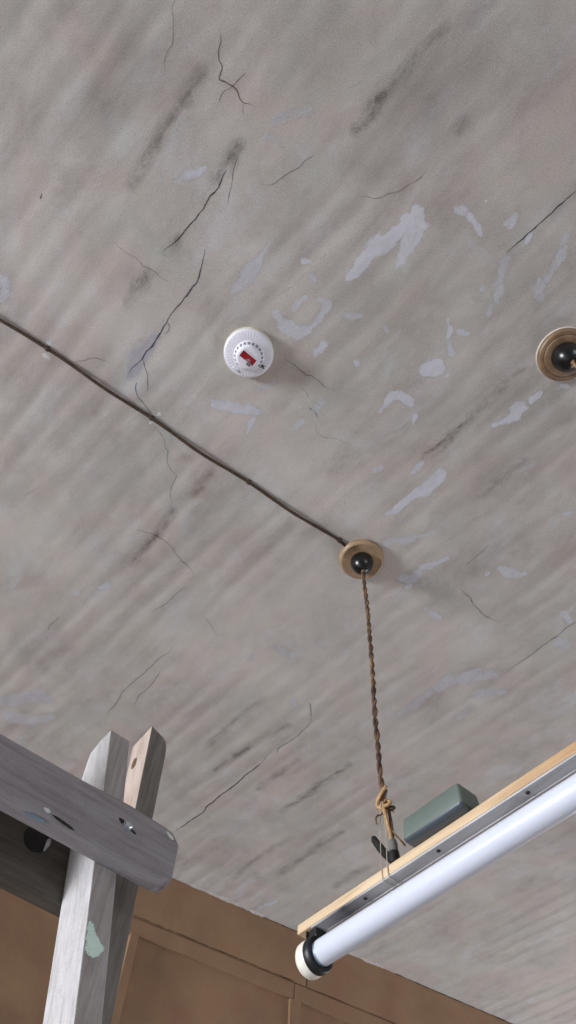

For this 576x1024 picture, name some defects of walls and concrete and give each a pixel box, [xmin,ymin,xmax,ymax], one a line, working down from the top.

crack [218,34,247,104]
crack [167,171,226,248]
peeling [344,204,430,282]
crack [507,191,576,252]
crack [131,252,205,413]
peeling [271,294,364,357]
peeling [490,391,543,428]
peeling [385,460,446,523]
crack [176,704,311,831]